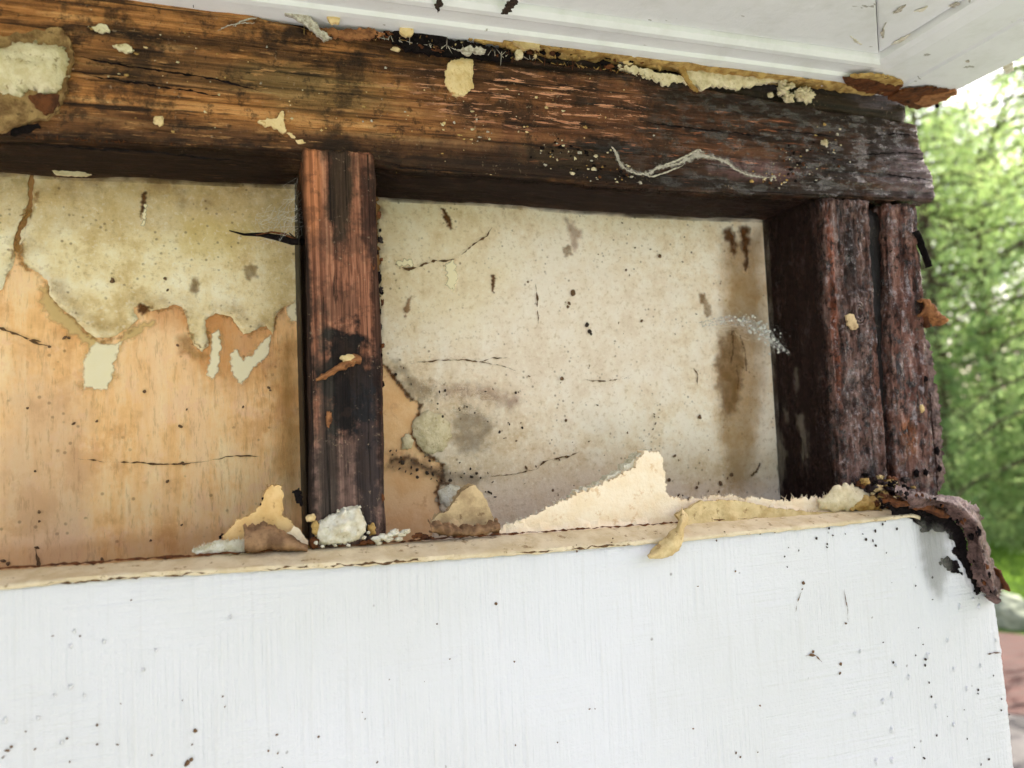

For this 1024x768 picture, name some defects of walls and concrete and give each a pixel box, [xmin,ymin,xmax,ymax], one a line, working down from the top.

crack [395,231,490,289]
peeling [0,251,302,581]
crack [77,455,258,465]
crack [424,357,515,371]
damp [678,227,760,500]
peeling [878,446,1011,604]